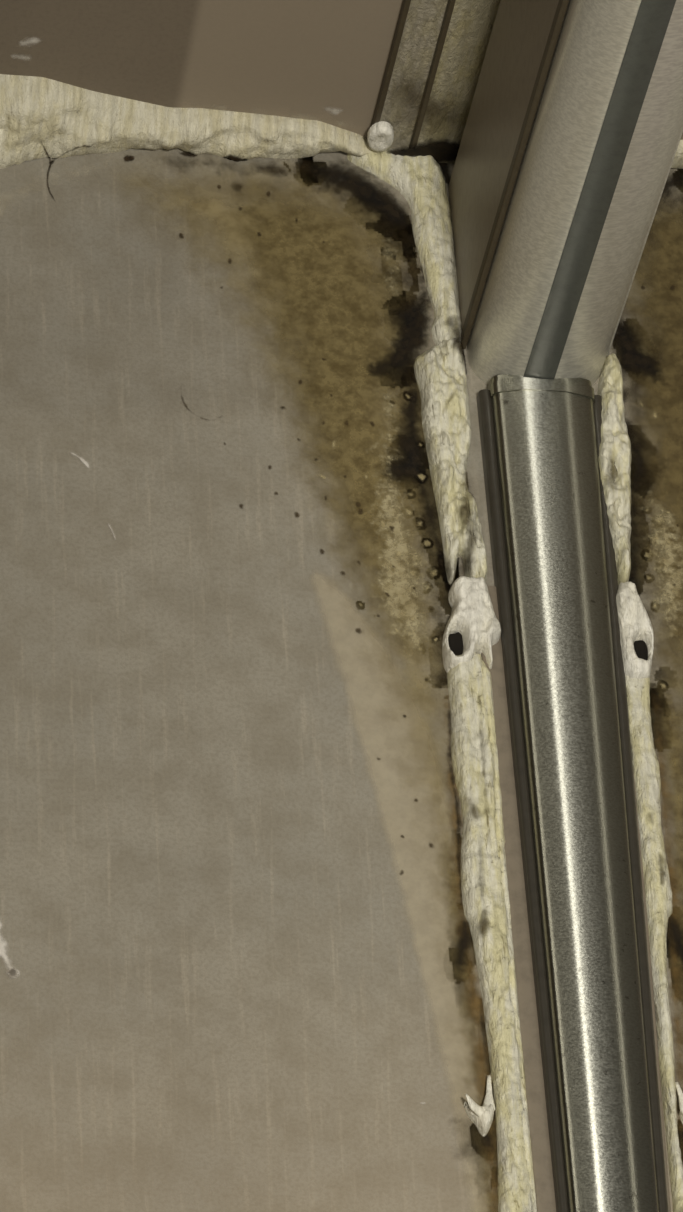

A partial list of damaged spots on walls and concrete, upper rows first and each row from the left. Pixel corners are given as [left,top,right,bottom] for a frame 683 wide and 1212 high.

water stain [170,161,443,728]
water stain [614,176,683,995]
peeling [0,923,19,977]
water stain [437,773,488,1023]
water stain [478,1040,487,1106]